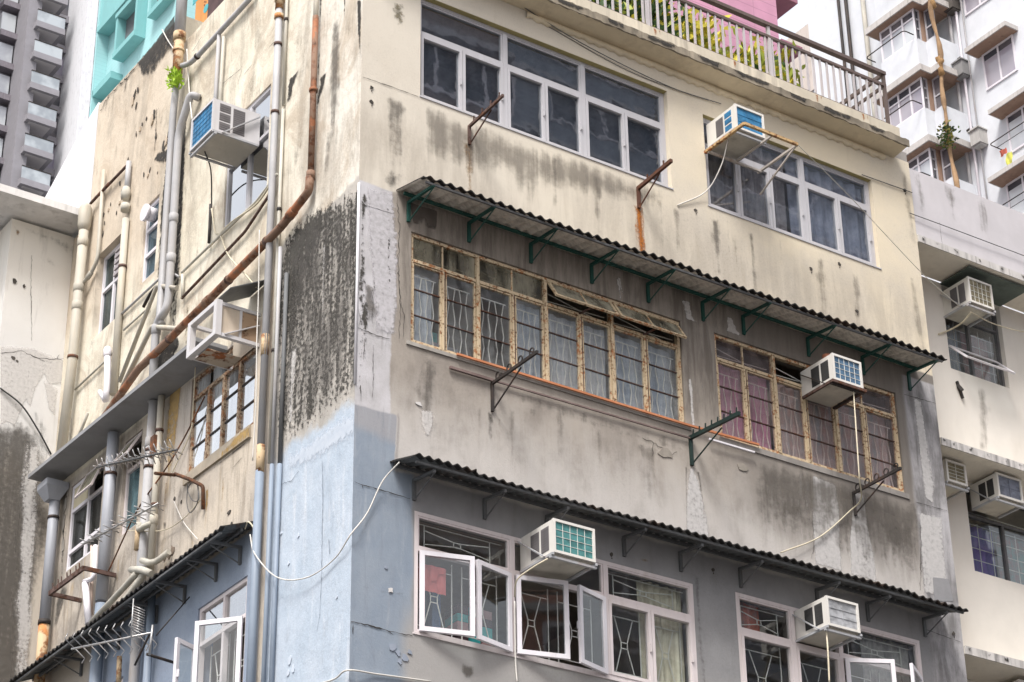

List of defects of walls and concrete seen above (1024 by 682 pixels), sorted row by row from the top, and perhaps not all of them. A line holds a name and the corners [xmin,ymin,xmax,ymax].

water stain [431,118,622,190]
corrosion [635,207,645,251]
crack [4,257,64,361]
water stain [276,192,375,439]
water stain [0,428,45,682]
water stain [764,472,913,546]